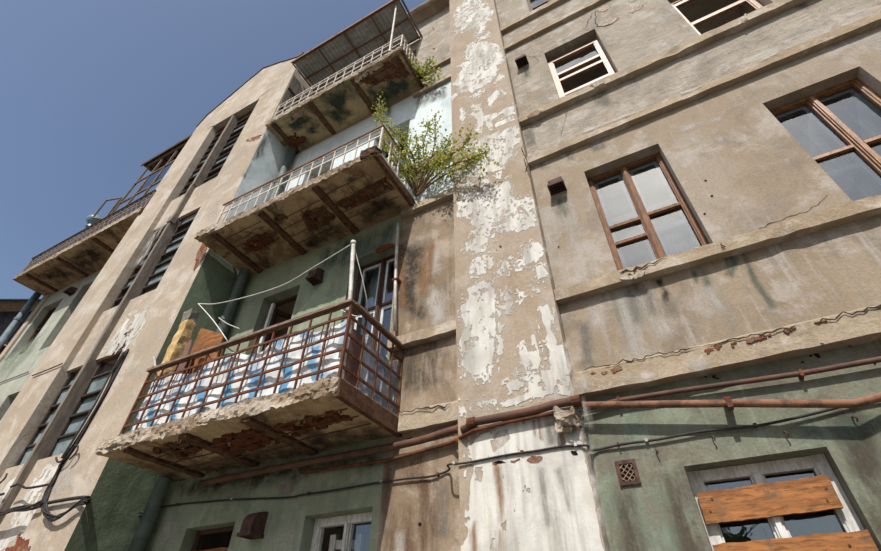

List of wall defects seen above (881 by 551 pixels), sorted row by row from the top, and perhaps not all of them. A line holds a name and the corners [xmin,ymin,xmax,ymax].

spalling [193,243,207,271]
damp [400,246,444,322]
peeling [452,0,604,551]
crack [620,258,665,273]
peeling [101,306,150,356]
crack [582,326,793,372]
spalling [704,333,772,355]
crack [816,304,881,324]
spalling [149,408,371,470]
peeling [0,461,58,551]